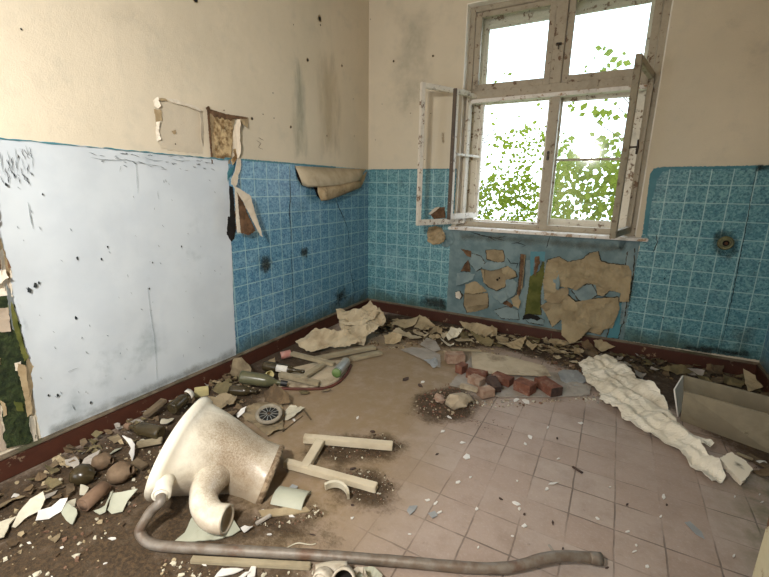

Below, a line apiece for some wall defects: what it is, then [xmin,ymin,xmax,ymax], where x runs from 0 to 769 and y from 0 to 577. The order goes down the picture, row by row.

peeling [153,97,204,154]
peeling [0,257,13,297]
peeling [455,248,635,344]
crack [721,166,757,345]